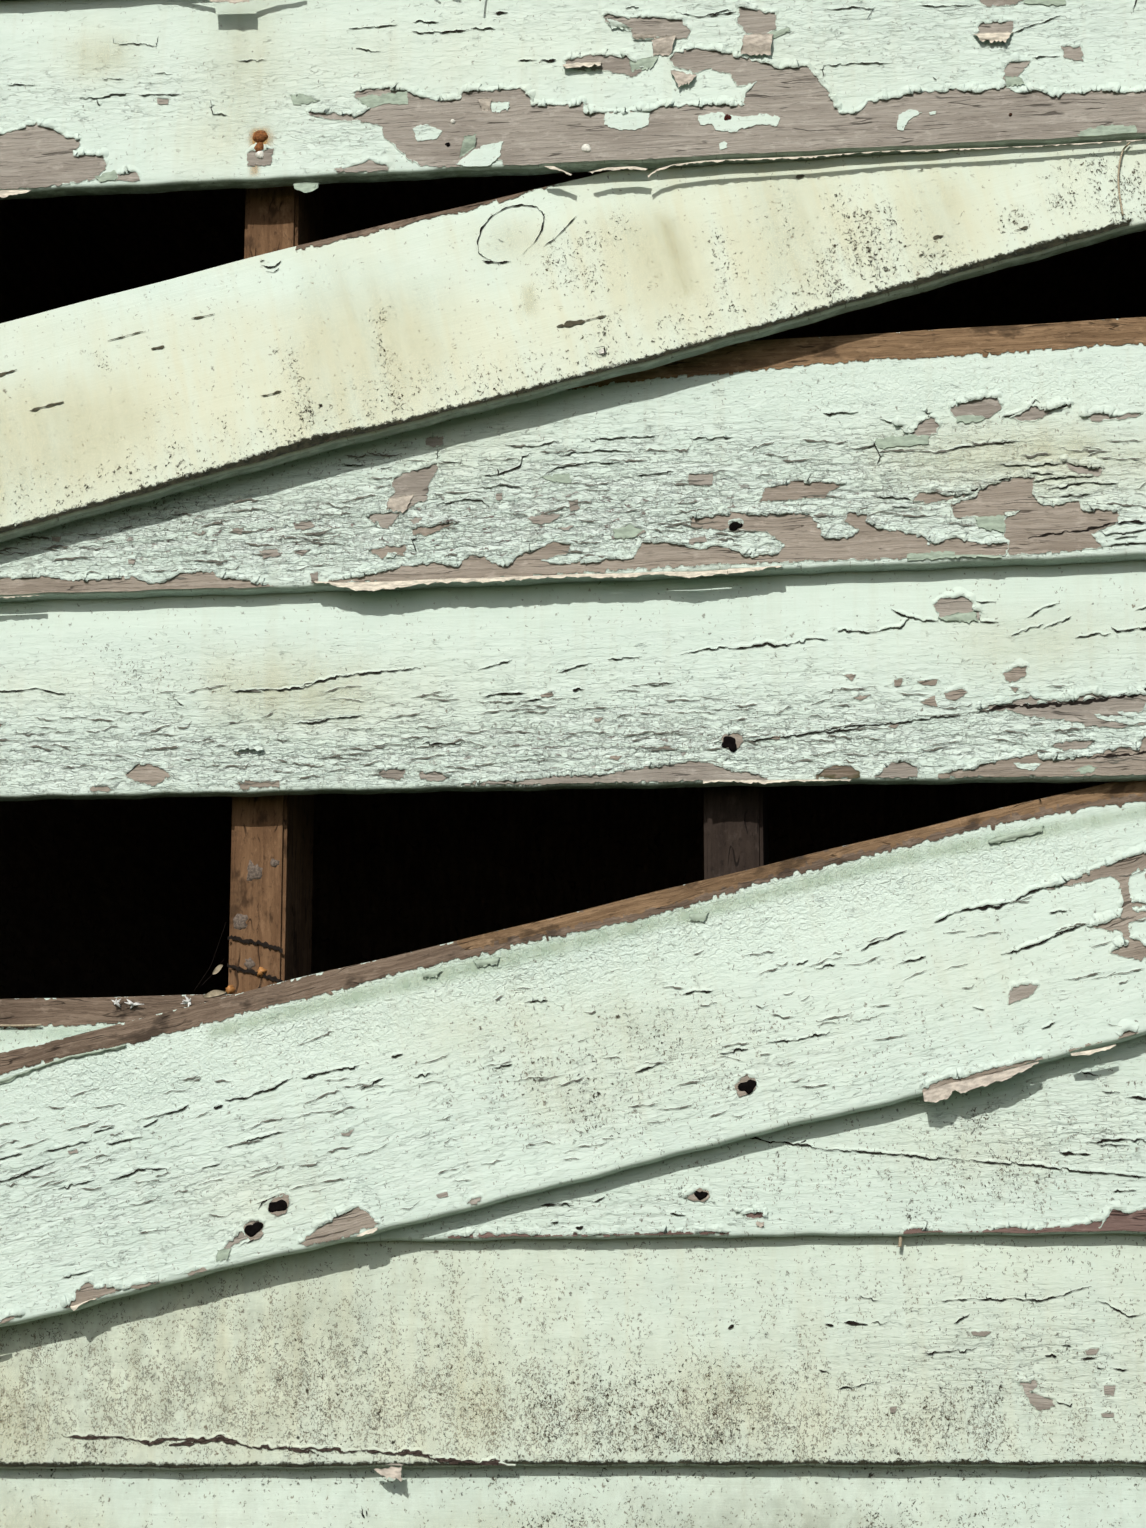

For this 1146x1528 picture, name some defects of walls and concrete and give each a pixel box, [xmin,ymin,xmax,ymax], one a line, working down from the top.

peeling [289,0,1146,178]
peeling [0,118,141,198]
peeling [0,429,1122,599]
crack [976,599,1146,638]
crack [0,608,1146,785]
peeling [375,657,1146,787]
peeling [1037,841,1146,962]
crack [0,884,1146,1245]
peeling [918,1049,1043,1103]
crack [826,1295,888,1326]
crack [922,1285,1145,1355]
crack [63,1431,516,1466]